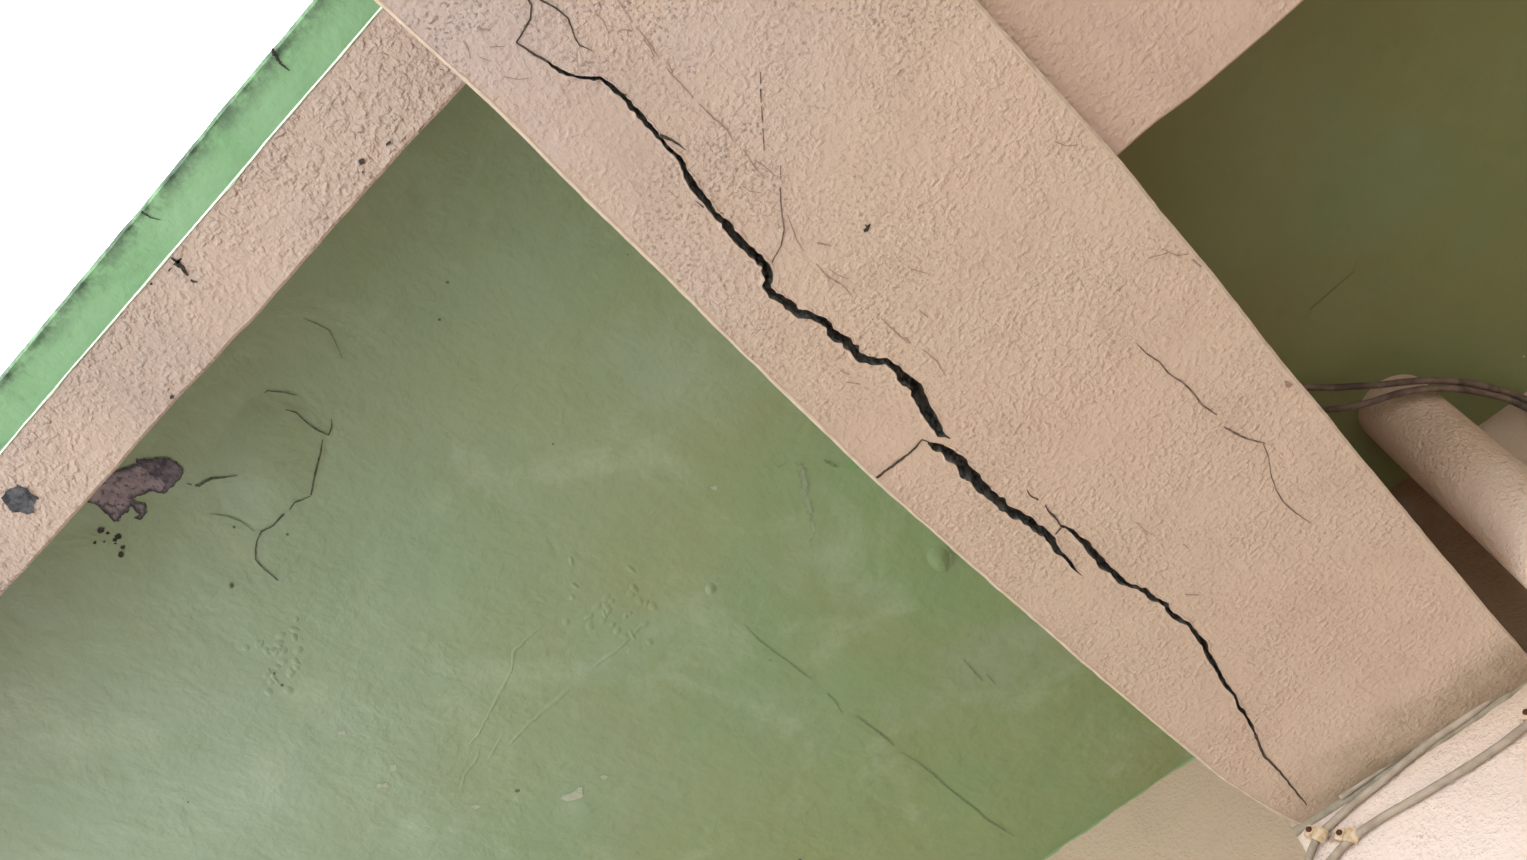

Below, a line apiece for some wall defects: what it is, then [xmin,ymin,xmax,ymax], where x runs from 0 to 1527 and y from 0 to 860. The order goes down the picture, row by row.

crack [303,318,343,359]
crack [463,0,1311,836]
peeling [0,484,39,515]
spalling [87,457,184,558]
crack [187,390,332,581]